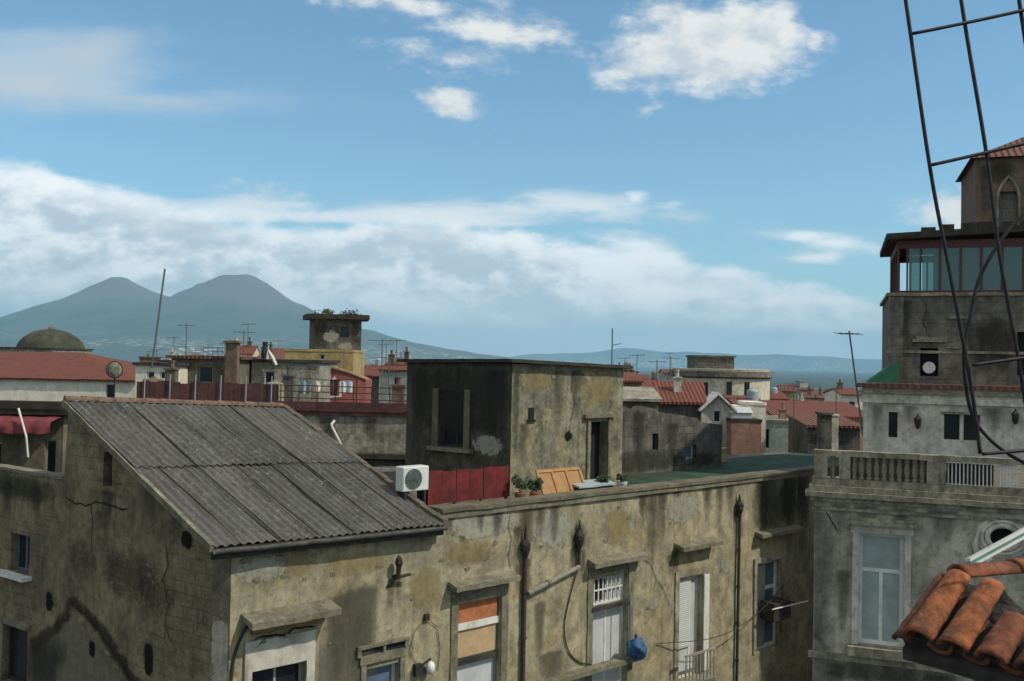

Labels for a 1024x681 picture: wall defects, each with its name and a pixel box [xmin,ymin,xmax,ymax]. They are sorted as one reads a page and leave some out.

peeling [472,435,503,455]
crack [65,496,127,544]